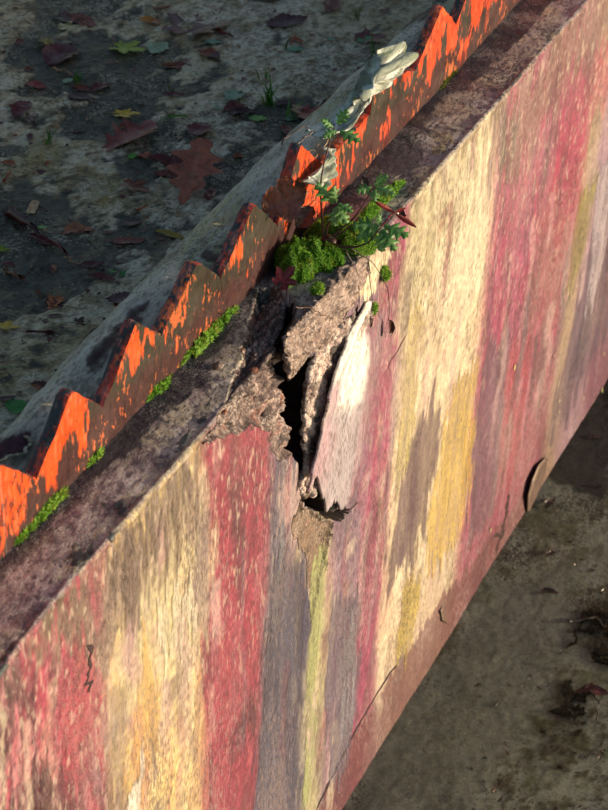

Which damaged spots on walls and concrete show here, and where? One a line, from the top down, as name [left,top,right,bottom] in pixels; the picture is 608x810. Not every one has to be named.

crack [270,302,310,477]
peeling [197,285,388,512]
crack [291,488,358,625]
corrosion [396,354,479,660]
peeling [0,640,16,678]